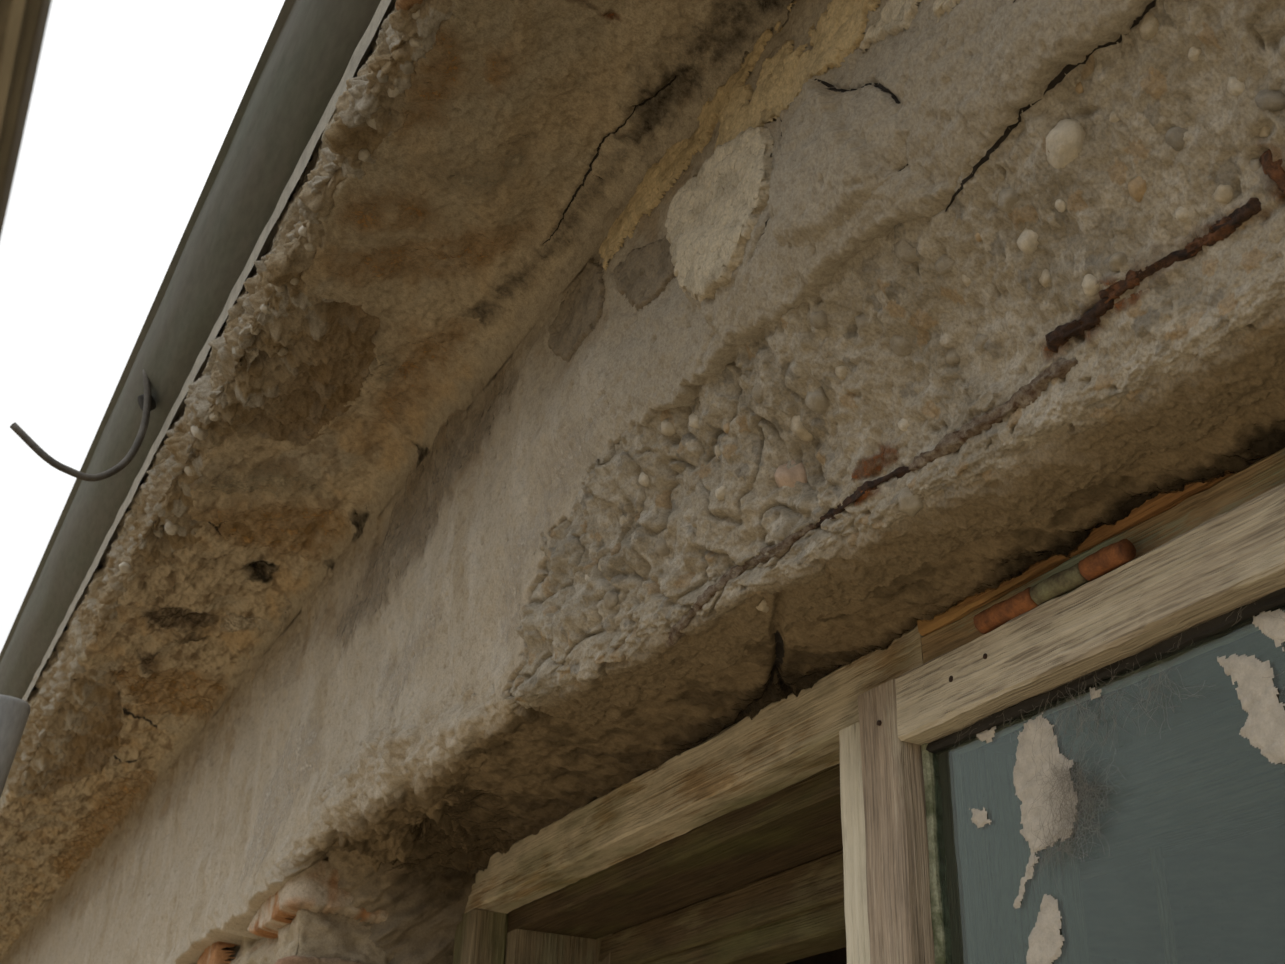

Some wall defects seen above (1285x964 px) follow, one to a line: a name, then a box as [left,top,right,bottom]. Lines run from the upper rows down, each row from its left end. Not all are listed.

crack [542,75,678,245]
crack [945,0,1155,212]
rust [1259,149,1285,200]
spalling [7,0,466,796]
spalling [509,0,1285,726]
rust [665,198,1261,648]
crack [769,631,792,694]